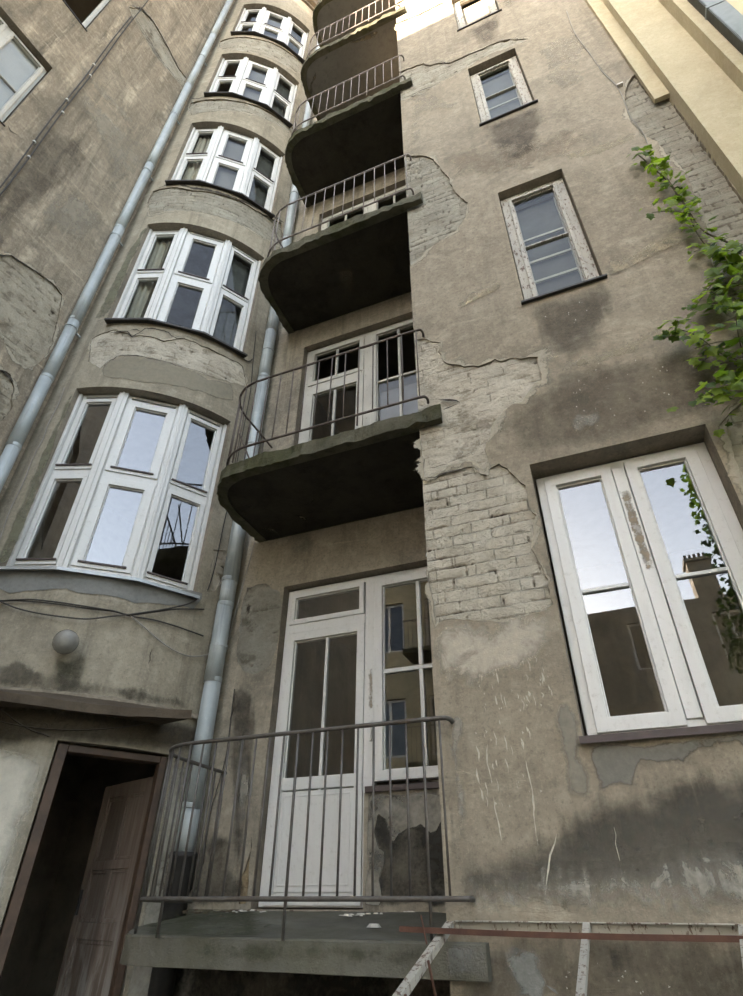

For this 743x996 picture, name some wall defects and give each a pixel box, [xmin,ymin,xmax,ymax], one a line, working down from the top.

crack [404,38,519,98]
water stain [493,111,537,157]
spalling [404,154,469,266]
spalling [622,74,743,335]
spalling [0,252,64,423]
spalling [87,328,249,387]
water stain [542,294,604,348]
spalling [414,329,557,627]
water stain [471,784,743,904]